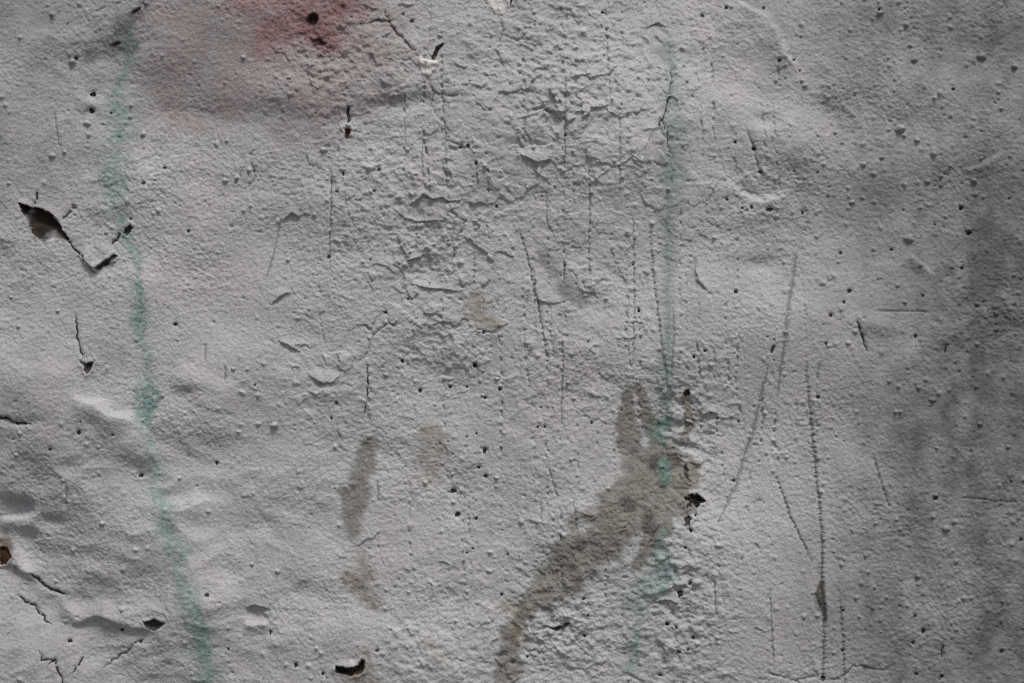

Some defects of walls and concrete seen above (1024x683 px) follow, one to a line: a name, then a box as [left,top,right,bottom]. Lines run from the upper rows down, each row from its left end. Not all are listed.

spalling [18,198,69,240]
spalling [95,254,118,270]
water stain [340,437,376,534]
spalling [683,465,705,524]
water stain [495,383,699,683]
spalling [143,619,165,630]
spalling [335,658,365,676]